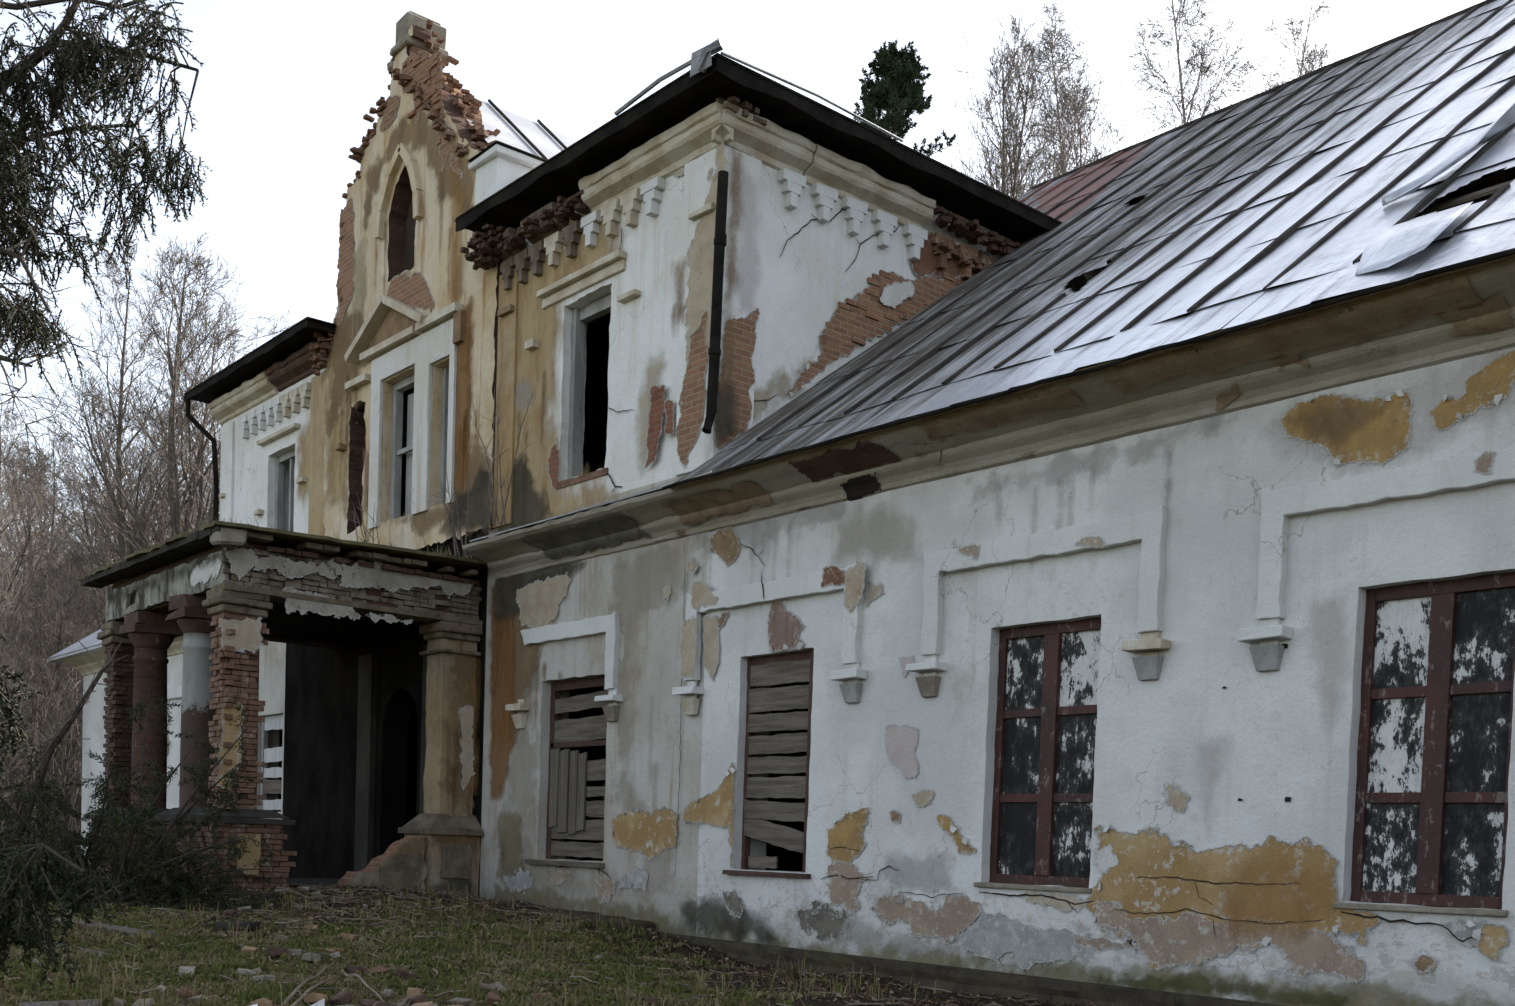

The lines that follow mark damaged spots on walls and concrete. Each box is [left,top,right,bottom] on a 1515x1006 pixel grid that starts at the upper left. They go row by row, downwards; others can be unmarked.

flaking render [380,50,463,179]
flaking render [645,137,760,469]
crack [780,209,901,272]
flaking render [786,229,975,397]
flaking render [1278,349,1515,466]
spalling [1473,450,1496,475]
spalling [767,601,804,653]
flaking render [611,763,735,892]
flaking render [884,723,976,855]
spalling [1161,781,1191,813]
flaking render [796,807,1381,983]
crack [820,847,1484,942]